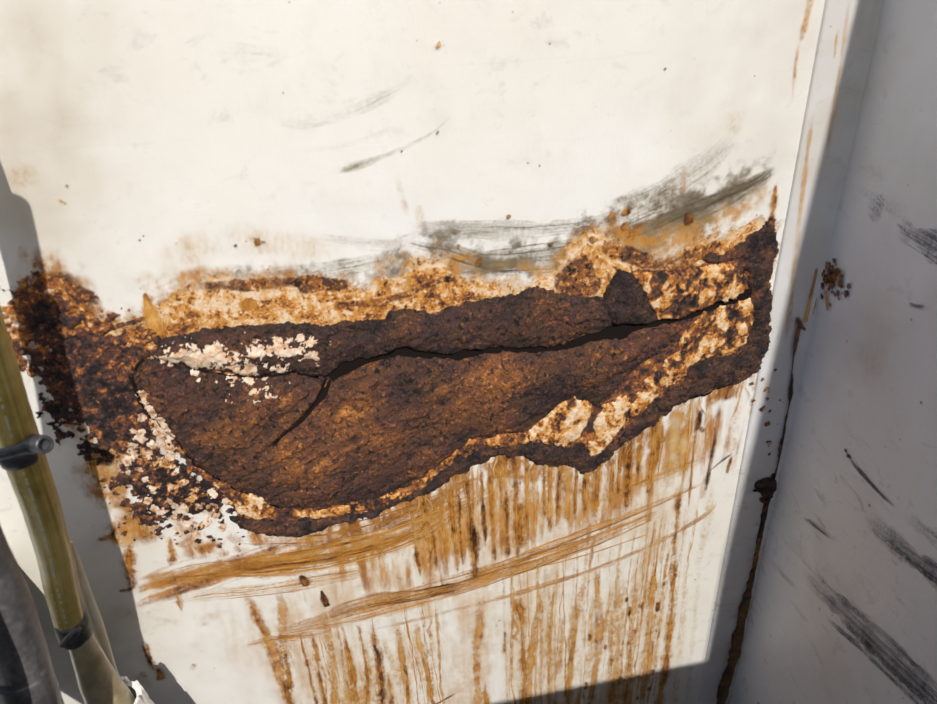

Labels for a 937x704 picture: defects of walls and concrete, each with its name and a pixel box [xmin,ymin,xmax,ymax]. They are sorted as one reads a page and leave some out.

rust [1,186,784,704]
crack [128,289,752,509]